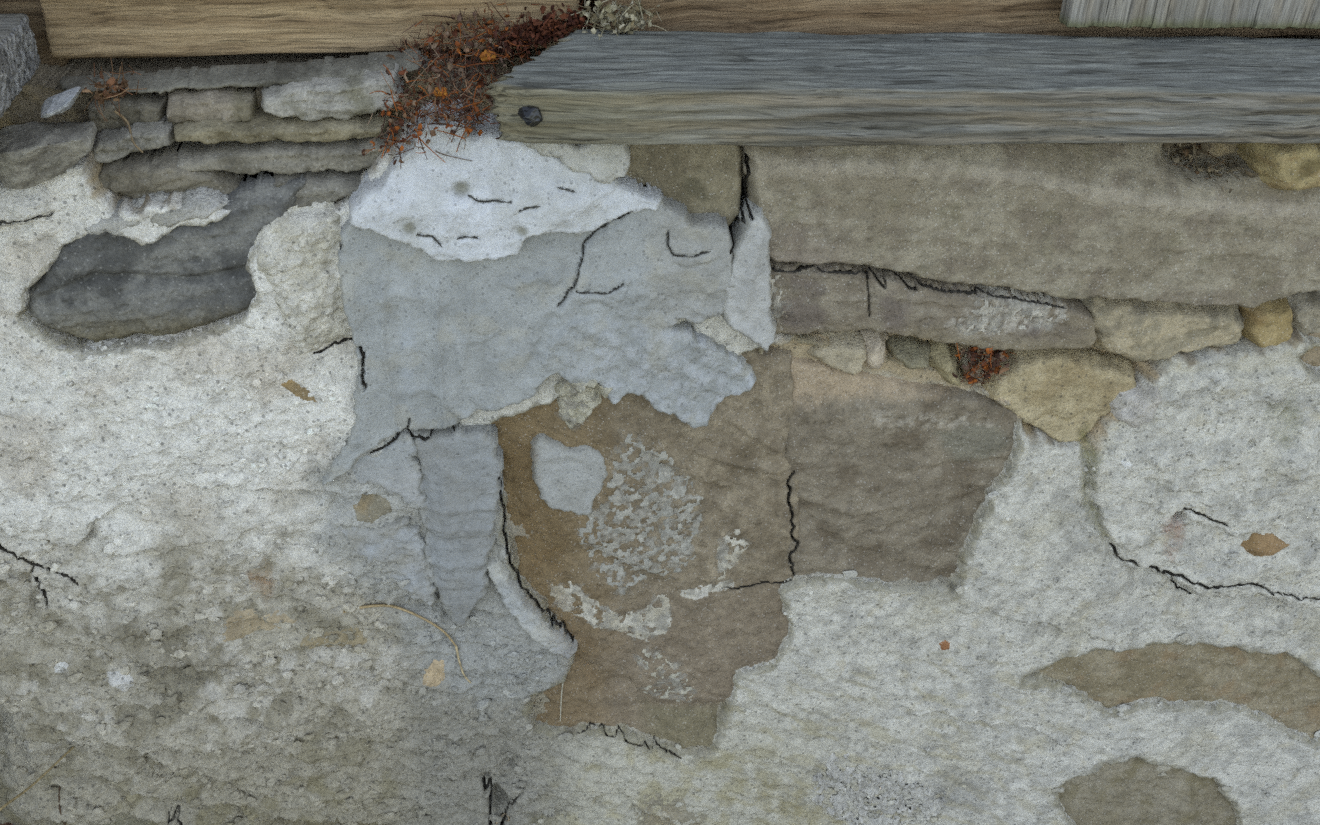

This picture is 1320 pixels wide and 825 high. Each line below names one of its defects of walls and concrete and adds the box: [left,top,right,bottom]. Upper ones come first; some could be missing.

crack [0,214,52,224]
spalling [28,171,307,343]
crack [771,264,1068,317]
spalling [492,194,1023,749]
crack [721,471,799,590]
crack [1176,507,1228,526]
crack [1110,543,1320,601]
spalling [1039,633,1320,738]
spalling [1051,757,1236,825]